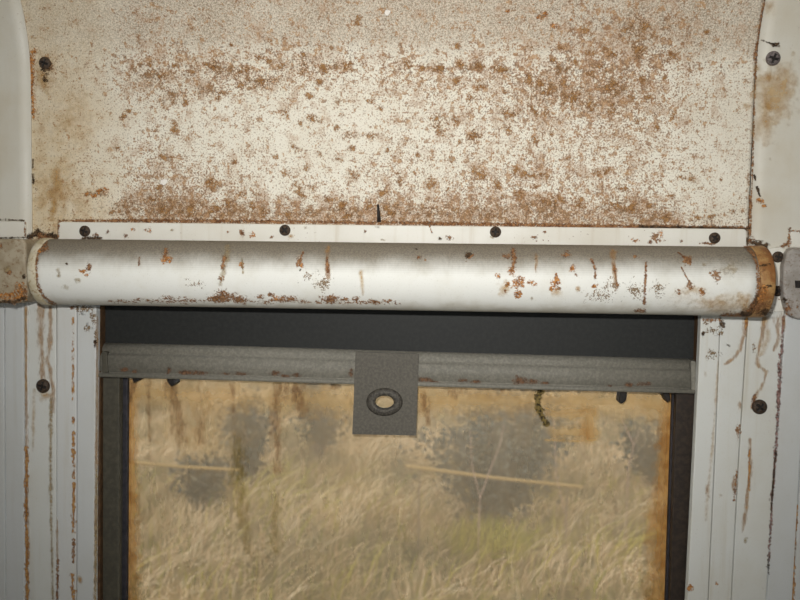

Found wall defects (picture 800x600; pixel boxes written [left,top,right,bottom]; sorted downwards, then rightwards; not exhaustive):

corrosion [616,12,670,60]
corrosion [30,49,53,119]
corrosion [129,52,354,108]
corrosion [493,45,651,133]
corrosion [335,98,378,151]
corrosion [430,115,459,137]
corrosion [0,166,772,352]
corrosion [767,297,799,574]
corrosion [743,439,751,521]